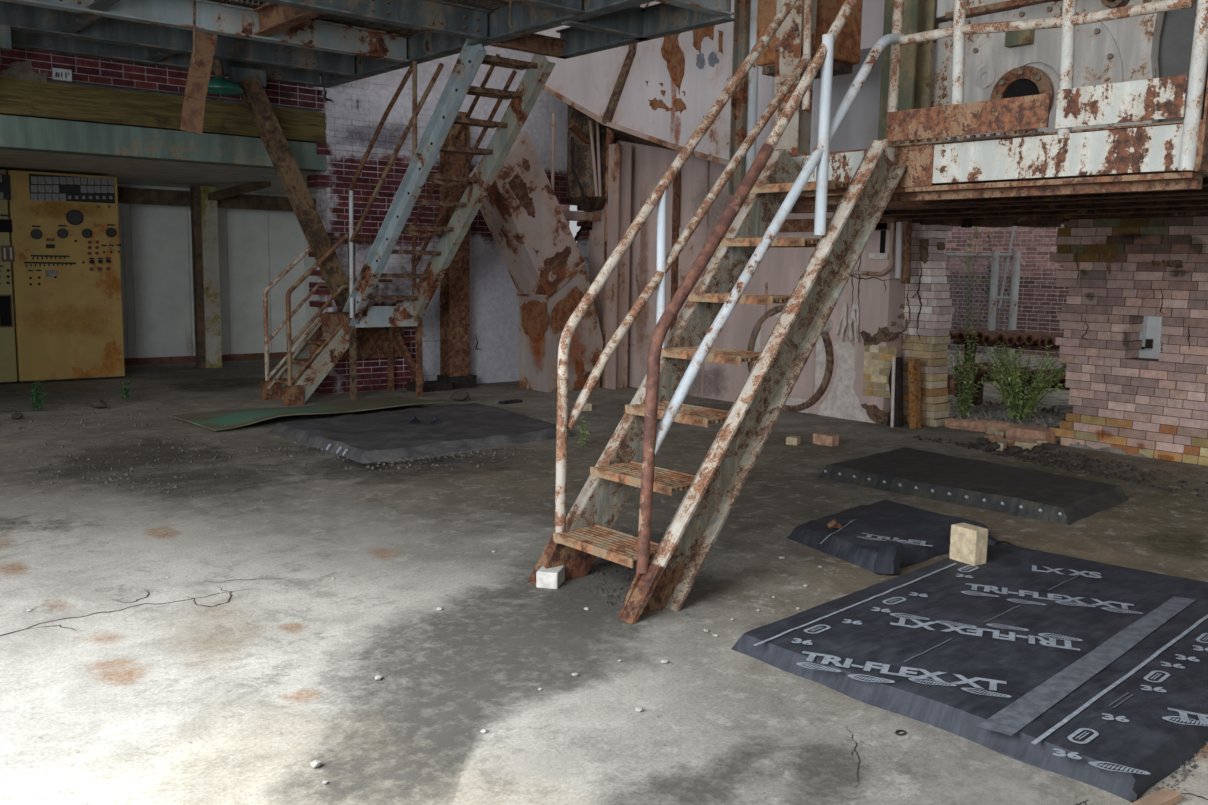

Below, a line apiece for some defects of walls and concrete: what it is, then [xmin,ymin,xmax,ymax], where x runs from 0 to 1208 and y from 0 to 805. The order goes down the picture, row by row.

crack [0,578,281,636]
damp [319,557,651,805]